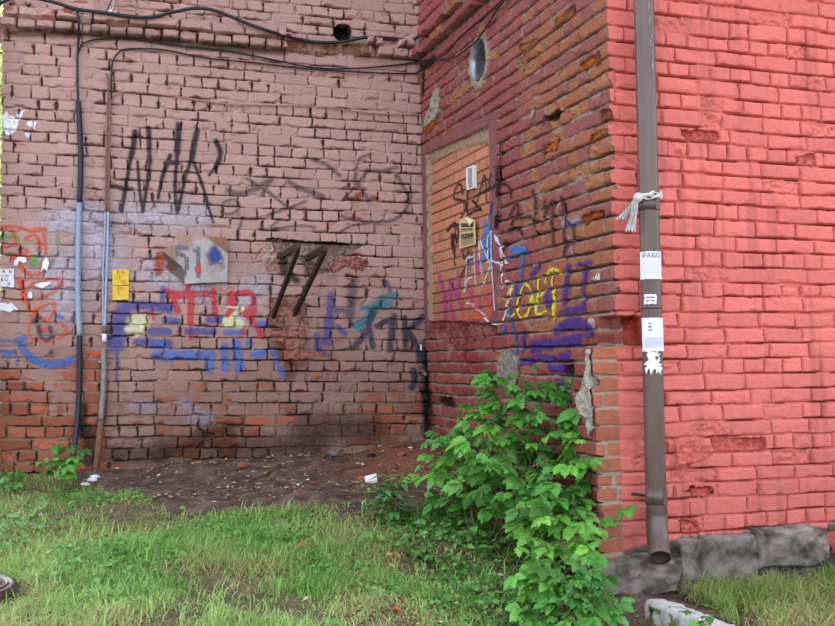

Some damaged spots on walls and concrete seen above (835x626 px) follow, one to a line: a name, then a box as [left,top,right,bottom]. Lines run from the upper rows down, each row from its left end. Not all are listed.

spalling [259,240,368,274]
spalling [710,435,766,452]